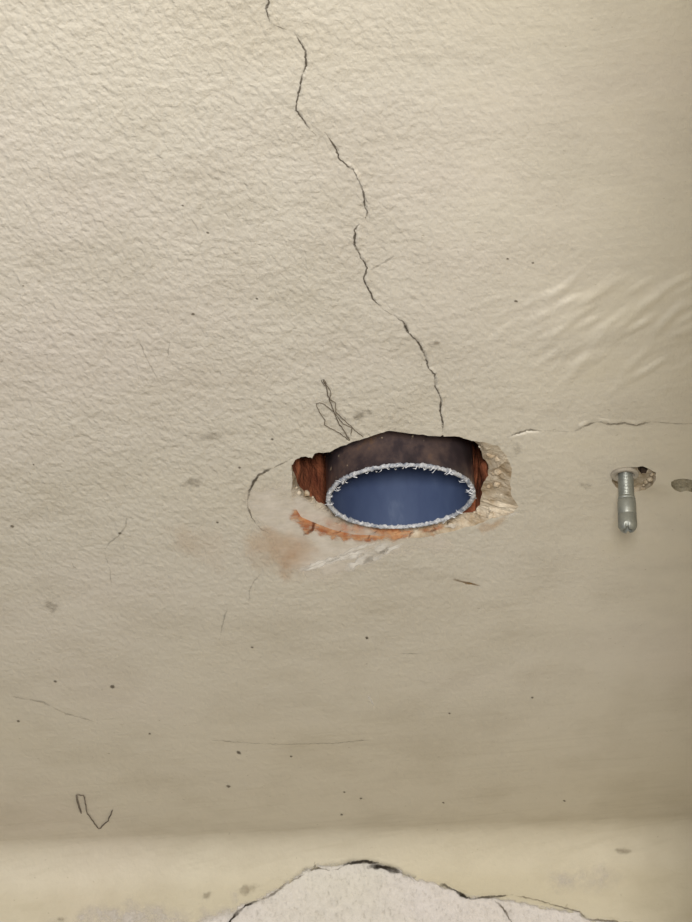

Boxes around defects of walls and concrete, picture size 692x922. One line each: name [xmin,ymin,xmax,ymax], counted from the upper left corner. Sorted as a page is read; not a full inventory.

crack [265,0,447,433]
crack [508,429,542,439]
crack [229,865,322,922]
crack [346,860,400,873]
peeling [202,856,656,922]
crack [443,884,618,922]